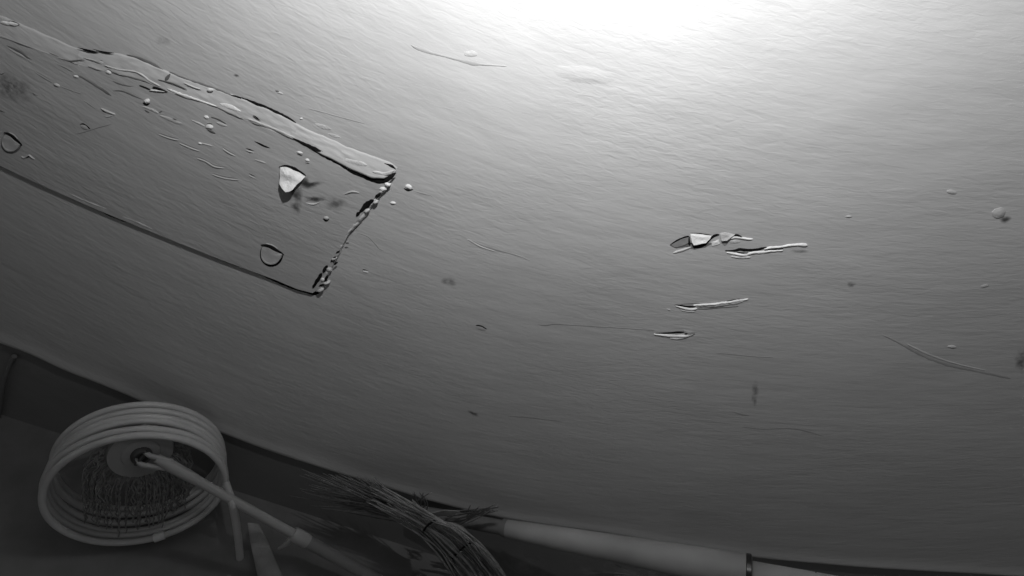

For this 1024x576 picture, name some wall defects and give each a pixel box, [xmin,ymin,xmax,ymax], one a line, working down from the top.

crack [411,45,504,66]
spalling [279,165,320,208]
spalling [312,182,391,292]
peeling [670,232,752,253]
crack [881,334,1010,379]